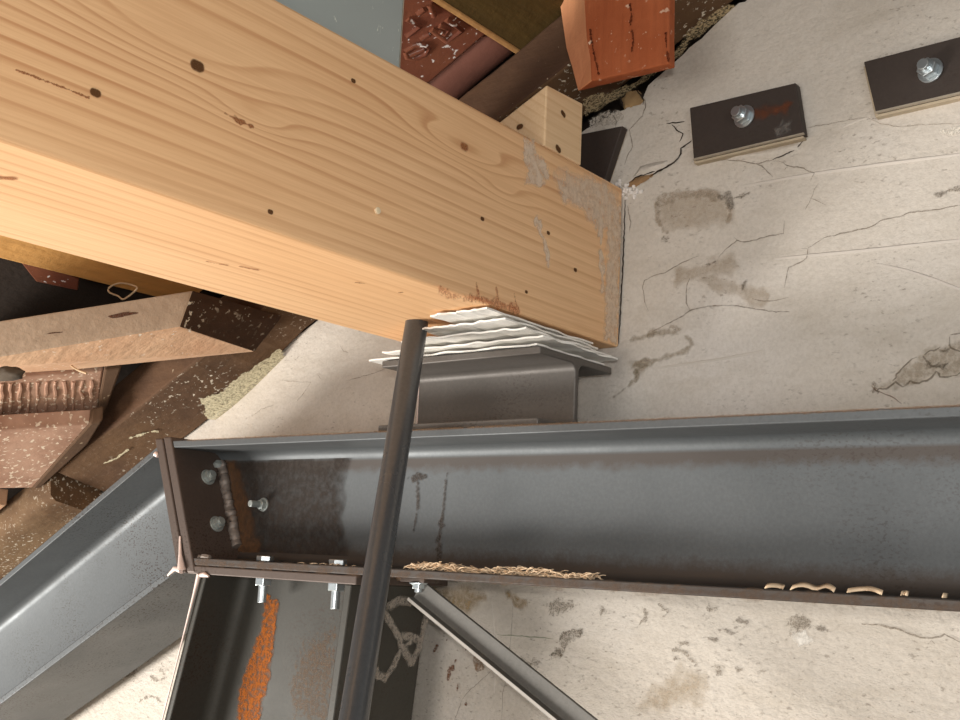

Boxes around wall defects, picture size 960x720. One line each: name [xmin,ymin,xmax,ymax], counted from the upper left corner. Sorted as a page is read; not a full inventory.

crack [651,121,691,176]
crack [729,141,814,175]
crack [618,205,788,344]
peeling [872,334,955,393]
rust [220,459,259,554]
rust [238,594,279,720]